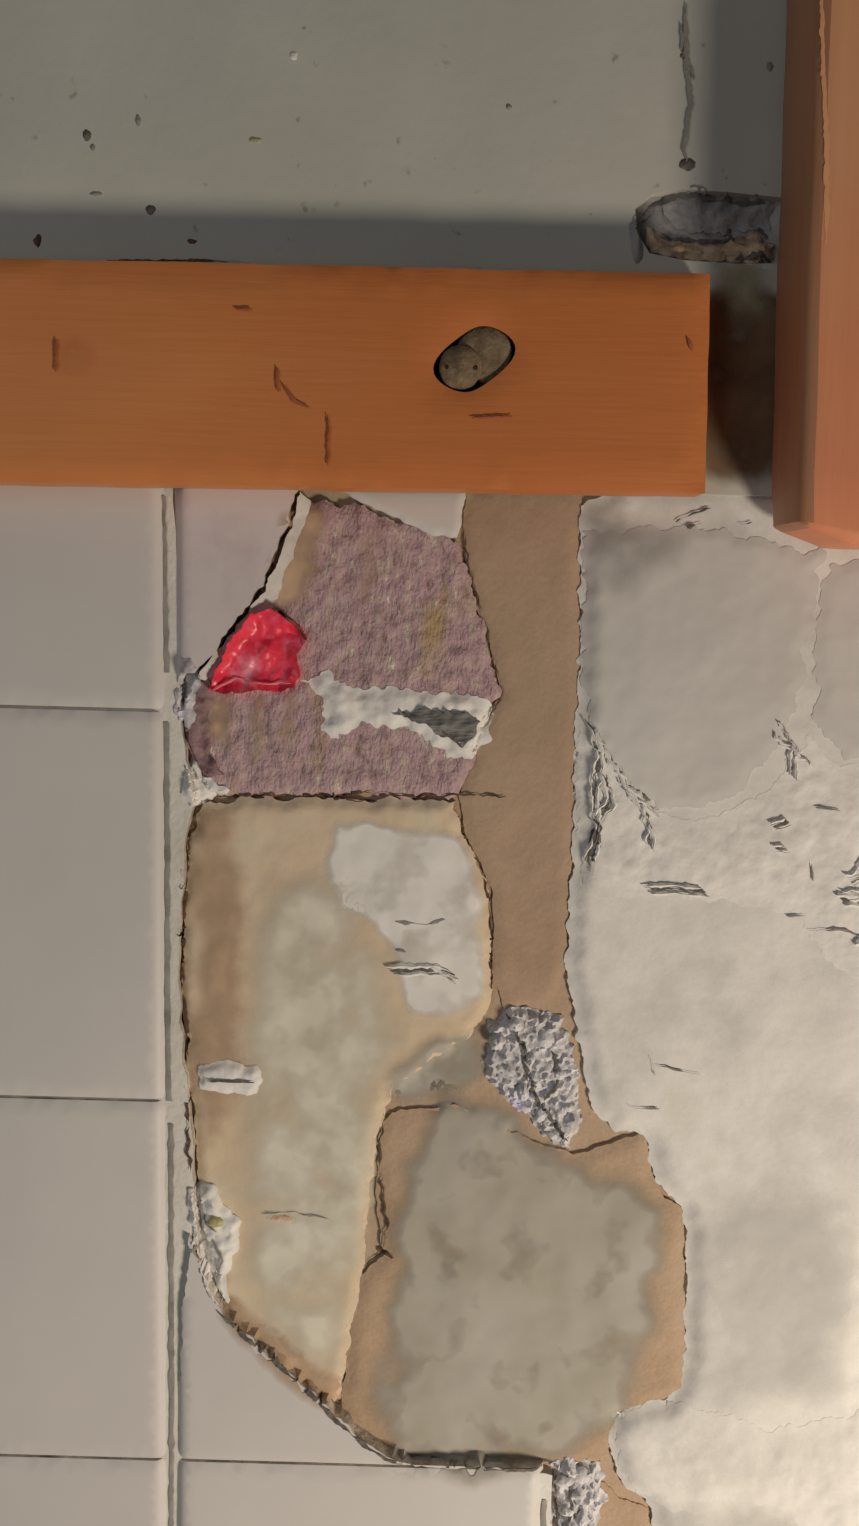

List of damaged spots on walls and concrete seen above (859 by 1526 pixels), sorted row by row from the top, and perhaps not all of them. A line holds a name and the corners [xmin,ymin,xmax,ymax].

flaking render [629,186,781,264]
peeling [198,492,312,694]
crack [215,791,505,1004]
crack [583,718,709,898]
crack [770,722,859,937]
peeling [341,492,859,1526]
crack [178,834,551,1472]